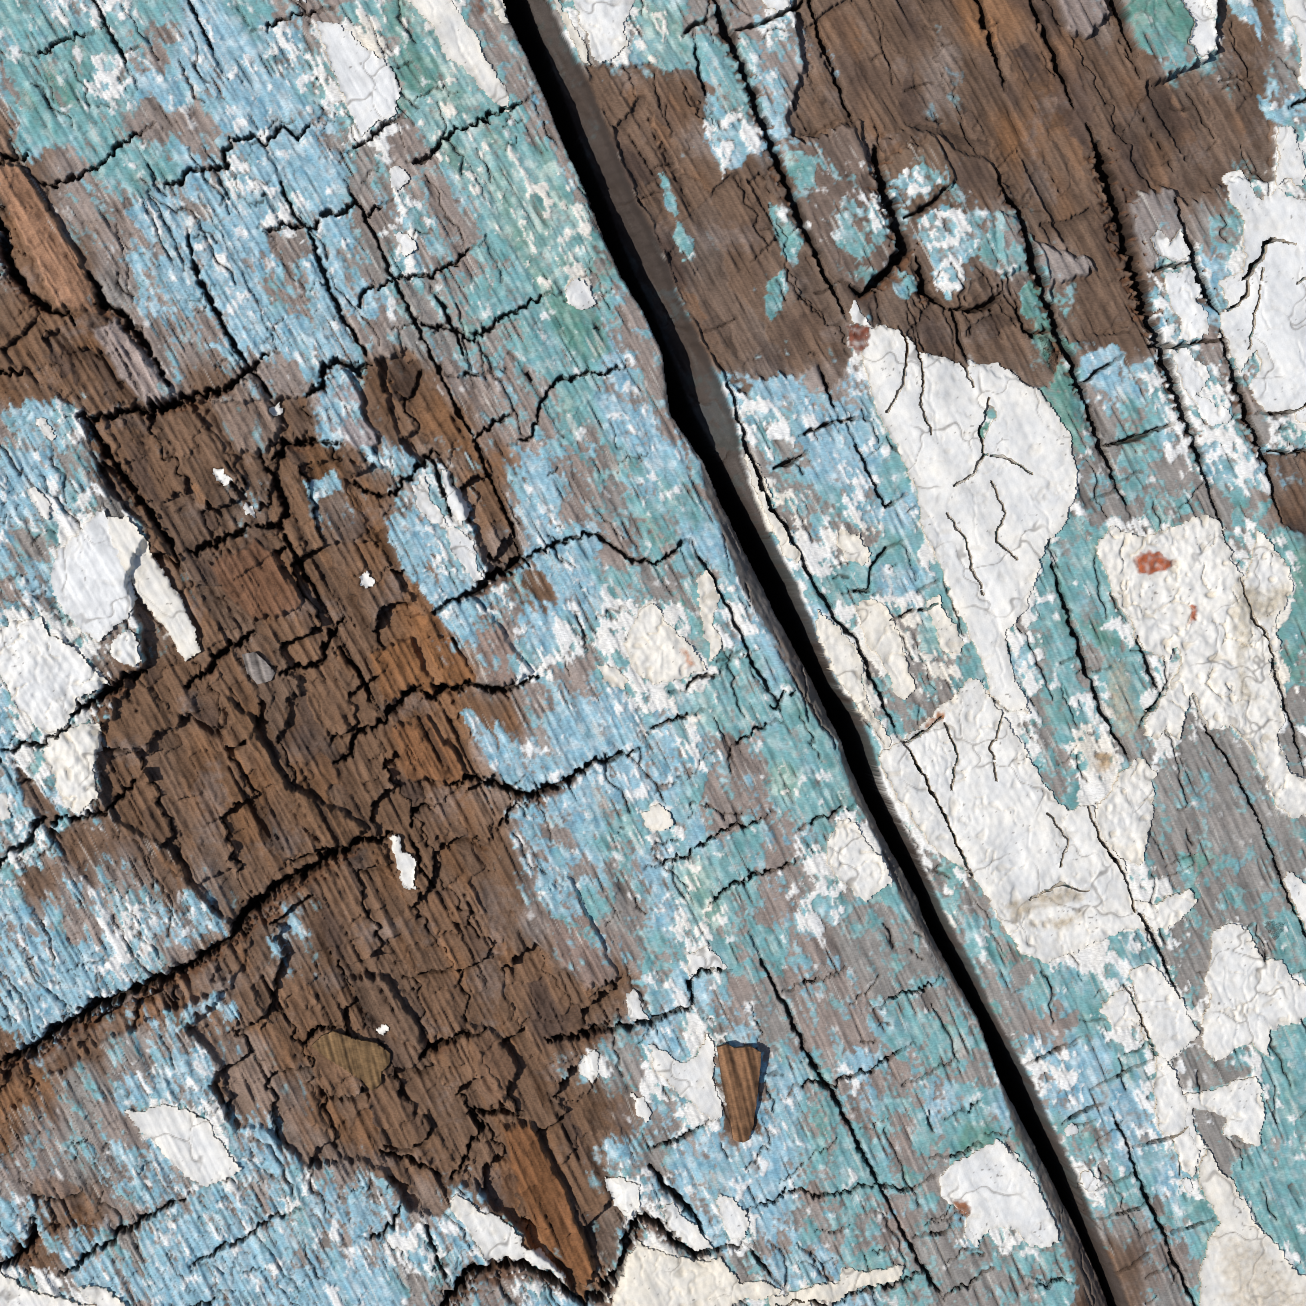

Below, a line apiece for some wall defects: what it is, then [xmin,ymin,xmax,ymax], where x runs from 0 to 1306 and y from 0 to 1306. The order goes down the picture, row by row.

crack [407,91,537,165]
peeling [585,61,852,395]
peeling [786,0,1306,432]
peeling [0,124,628,1306]
crack [0,111,798,1066]
peeling [979,406,996,438]
crack [682,0,1306,878]
crack [1030,806,1181,996]
crack [1050,555,1306,937]
peeling [1258,450,1306,687]
peeling [630,1092,651,1123]
crack [1062,984,1217,1305]